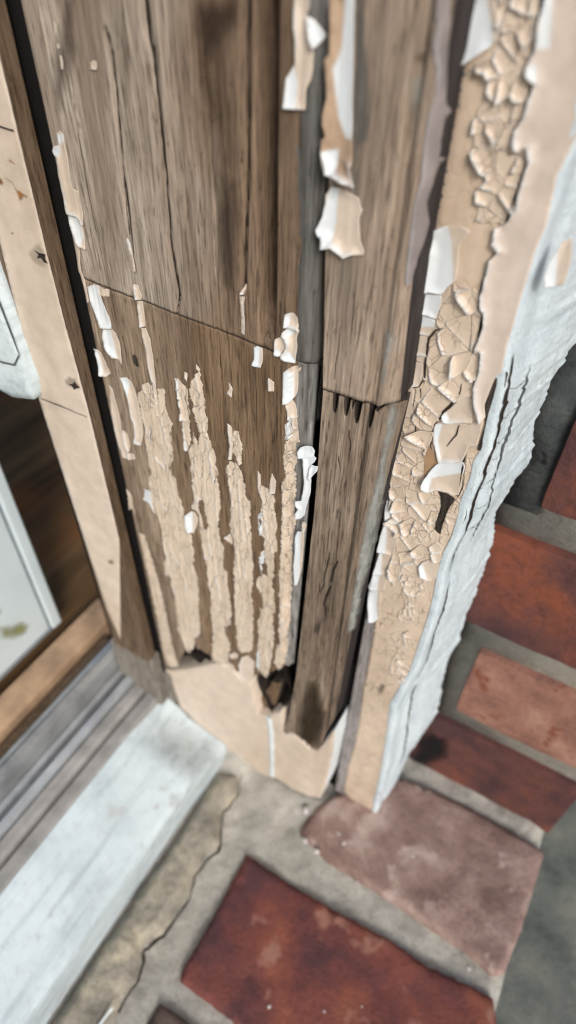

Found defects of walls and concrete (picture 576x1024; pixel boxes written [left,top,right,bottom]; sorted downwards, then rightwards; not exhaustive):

crack [107,32,136,269]
crack [145,0,181,309]
peeling [282,0,364,259]
peeling [52,130,318,681]
peeling [367,0,576,685]
crack [118,778,241,1013]